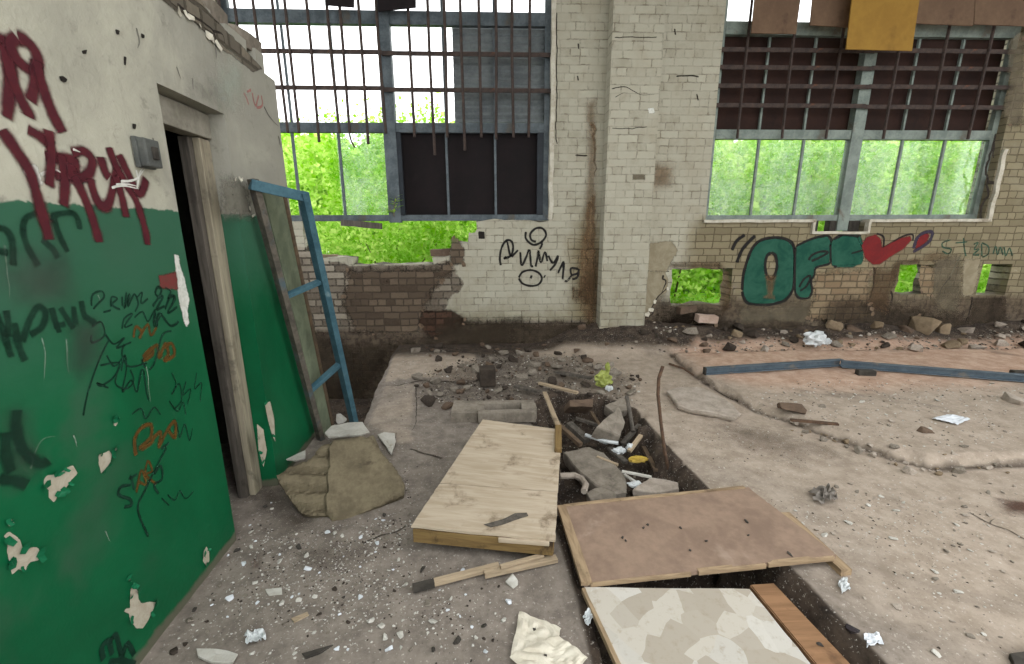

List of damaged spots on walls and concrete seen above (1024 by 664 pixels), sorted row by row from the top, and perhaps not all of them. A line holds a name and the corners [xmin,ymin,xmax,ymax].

spalling [163,0,262,72]
rust [580,106,597,287]
spalling [340,236,466,340]
flaking render [645,271,669,318]
peeling [257,401,275,467]
peeling [44,466,77,502]
peeling [98,450,116,474]
peeling [4,519,48,574]
peeling [124,582,159,628]